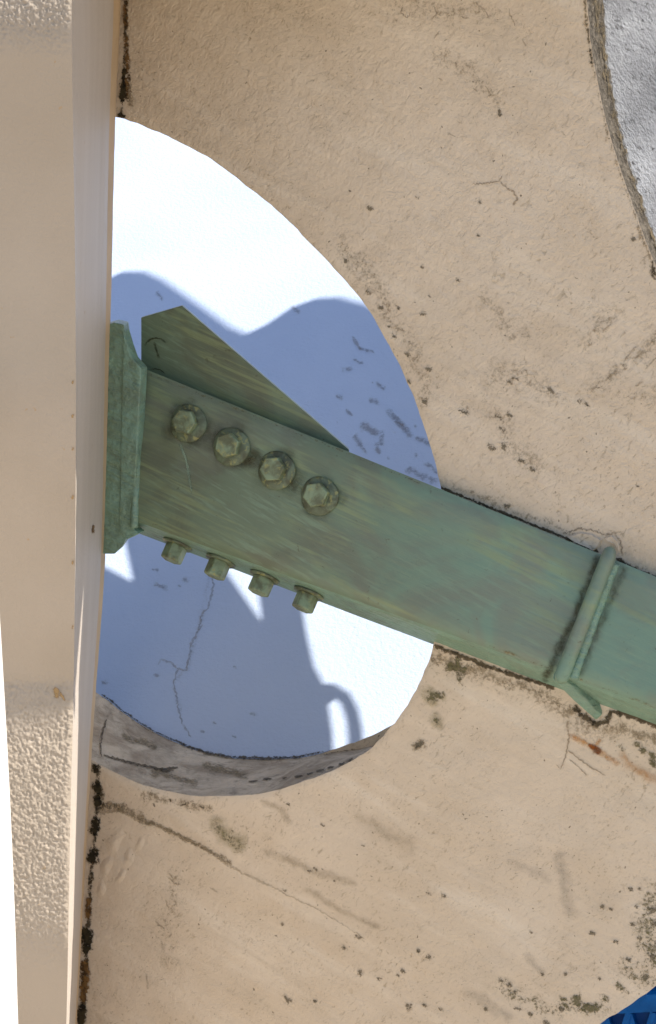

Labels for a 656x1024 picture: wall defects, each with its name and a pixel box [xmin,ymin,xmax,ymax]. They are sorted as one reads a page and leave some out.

leakage [117,0,132,118]
leakage [86,763,120,885]